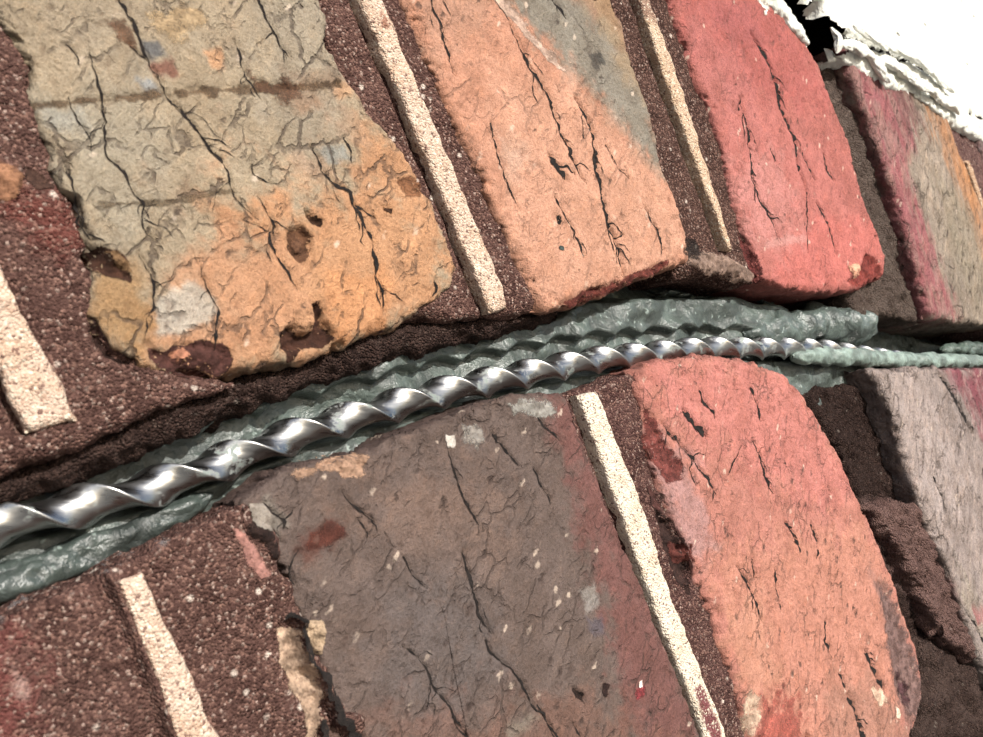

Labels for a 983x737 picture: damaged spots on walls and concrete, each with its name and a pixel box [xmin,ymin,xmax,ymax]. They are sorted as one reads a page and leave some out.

spalling [80,245,132,283]
spalling [87,317,125,364]
crack [64,44,175,347]
spalling [148,339,233,380]
crack [118,0,298,291]
spalling [287,215,323,263]
spalling [279,301,334,363]
crack [310,146,401,311]
crack [495,0,629,276]
crack [738,39,835,249]
crack [661,387,773,499]
spalling [878,584,921,724]